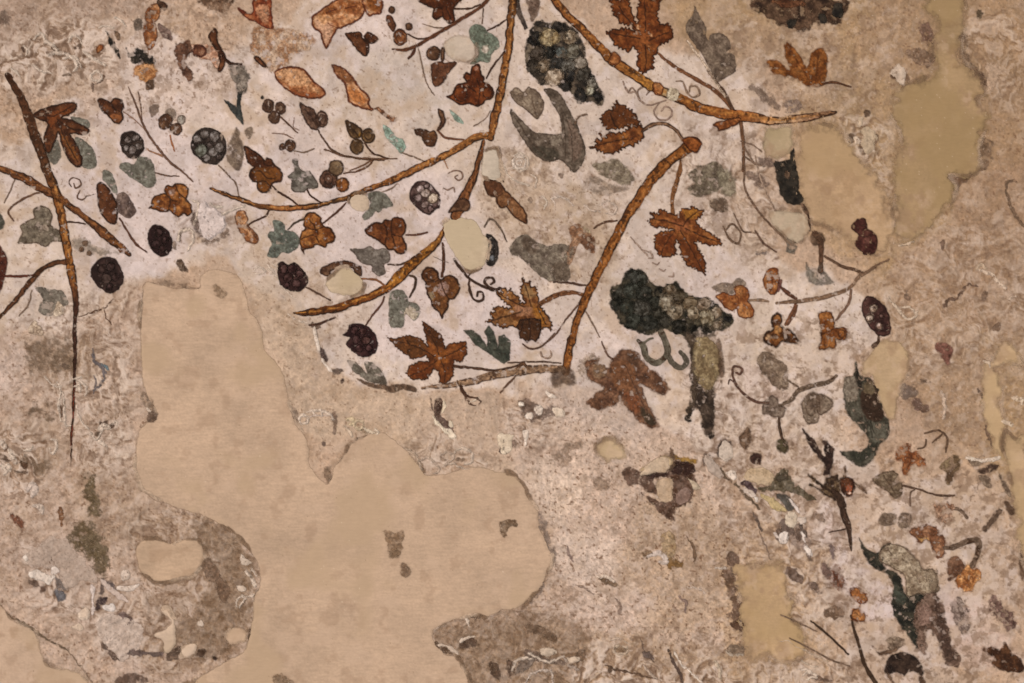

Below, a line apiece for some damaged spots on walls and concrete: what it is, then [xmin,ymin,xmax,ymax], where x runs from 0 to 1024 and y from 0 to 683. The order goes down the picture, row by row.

flaking render [763,0,1001,257]
flaking render [326,265,366,298]
flaking render [862,340,929,419]
flaking render [497,390,565,454]
flaking render [72,270,554,683]
flaking render [596,436,835,665]
flaking render [0,606,88,683]
flaking render [489,624,585,679]
flaking render [824,606,844,620]